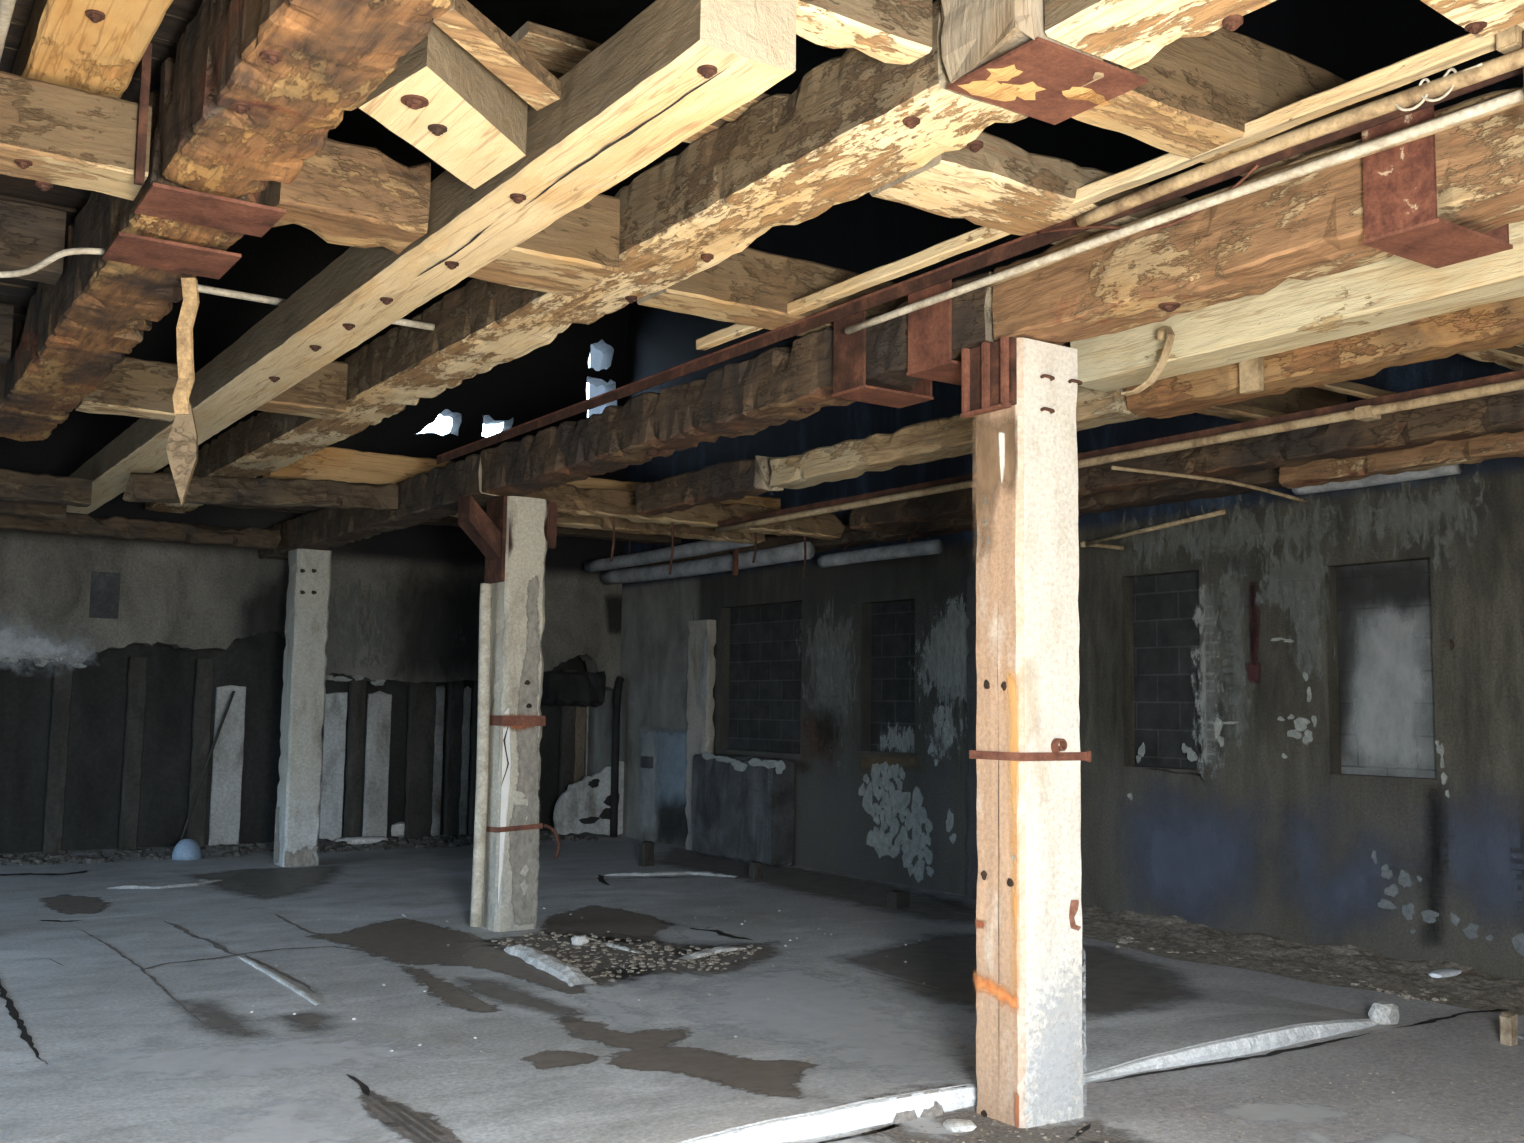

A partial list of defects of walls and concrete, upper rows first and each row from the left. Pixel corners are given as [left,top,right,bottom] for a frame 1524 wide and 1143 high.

leakage [0,627,86,662]
peeling [1136,742,1145,763]
peeling [1181,743,1198,762]
peeling [1214,718,1239,747]
peeling [1277,672,1317,759]
spalling [579,779,620,824]
peeling [859,761,957,883]
leakage [655,850,977,1005]
crack [0,979,48,1064]
leakage [307,918,819,1099]
leakage [1082,946,1193,1015]
crack [347,1074,370,1096]